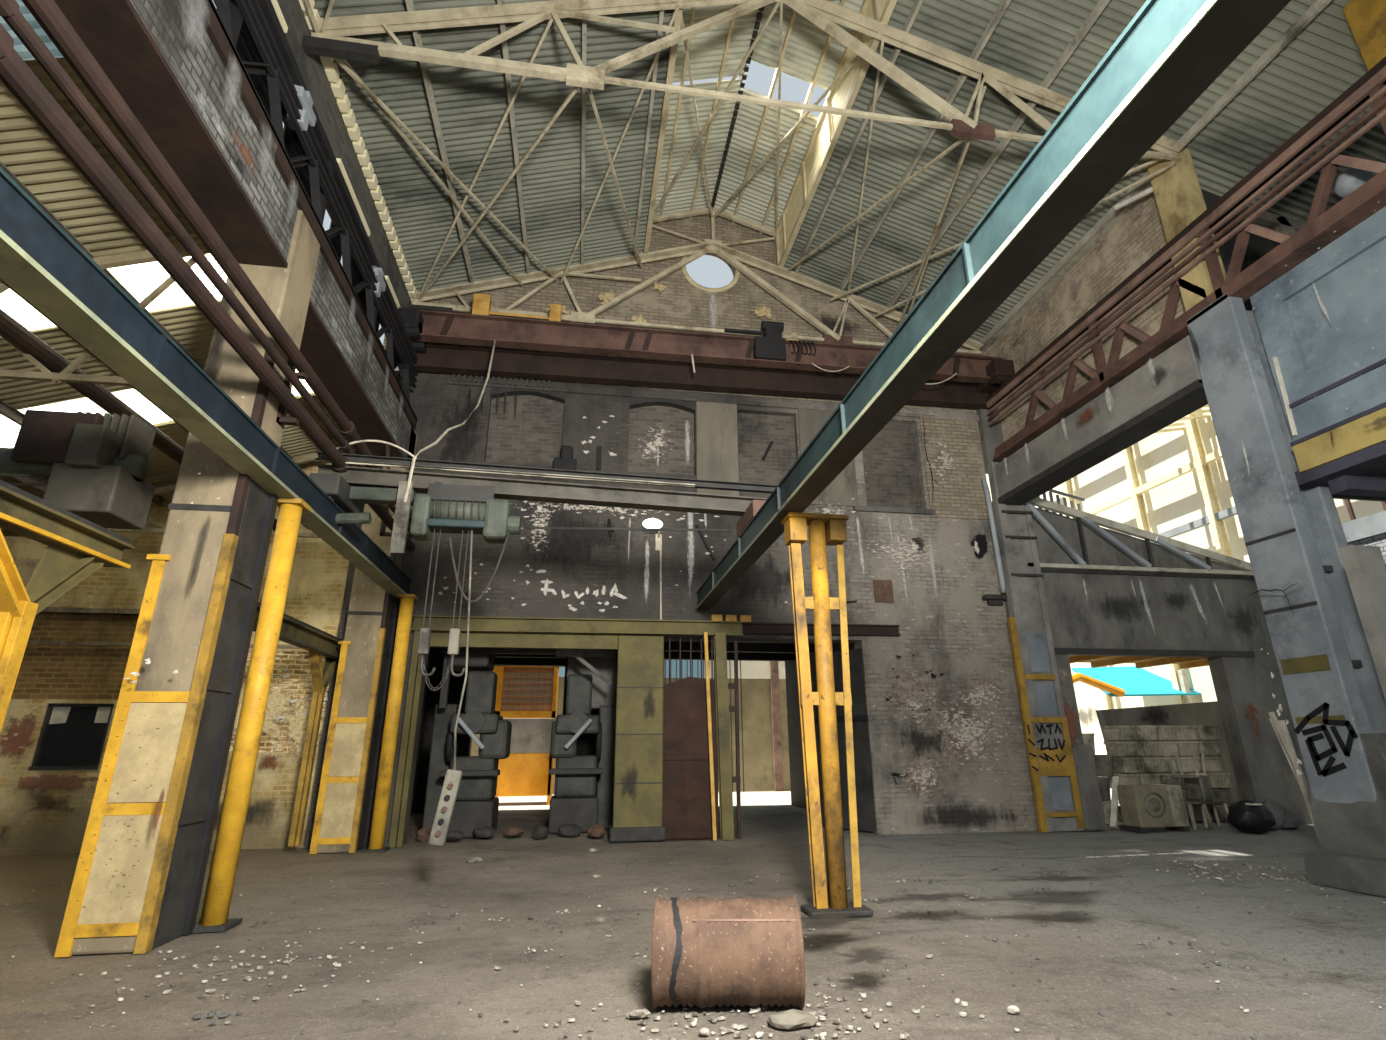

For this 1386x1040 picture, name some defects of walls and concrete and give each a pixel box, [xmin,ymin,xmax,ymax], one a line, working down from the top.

peeling [638,424,671,463]
damp [539,517,649,596]
peeling [513,501,720,612]
damp [740,554,791,602]
spalling [0,706,37,759]
damp [902,729,941,756]
spalling [876,654,1013,801]
spalling [17,772,118,795]
damp [924,806,1015,826]